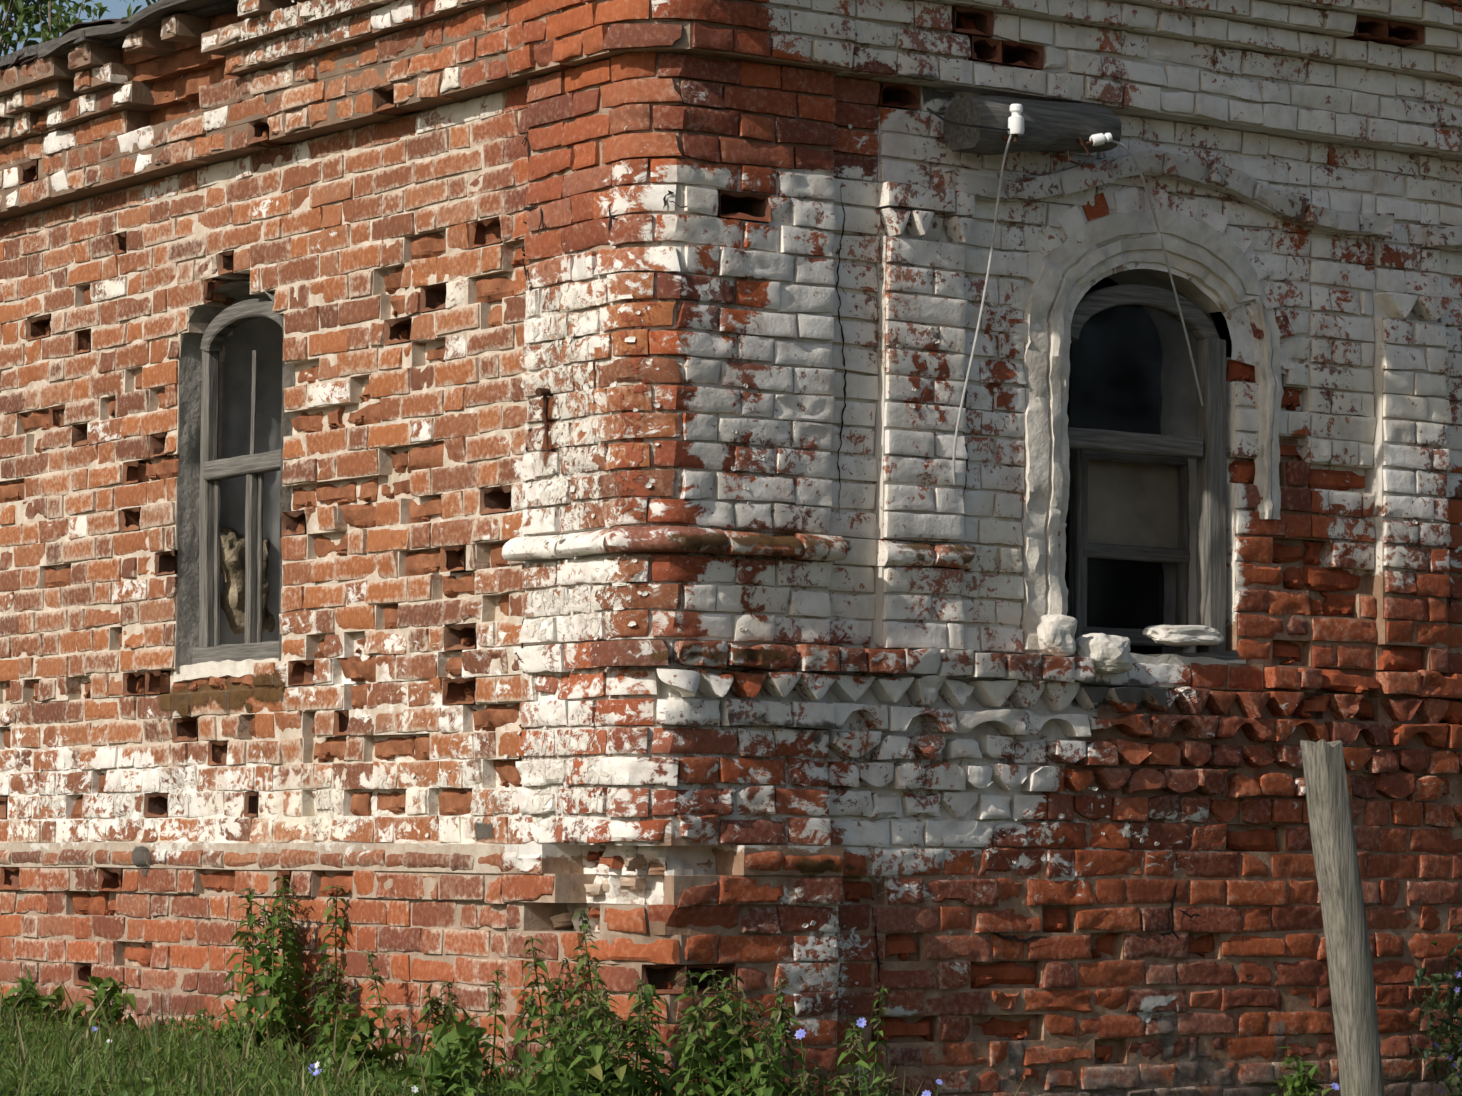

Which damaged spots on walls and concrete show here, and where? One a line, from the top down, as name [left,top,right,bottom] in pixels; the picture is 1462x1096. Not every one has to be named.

spalling [888,6,1044,69]
spalling [1344,15,1424,47]
spalling [716,189,771,223]
peeling [469,217,661,543]
spalling [1279,444,1365,491]
spalling [1272,510,1433,616]
peeling [524,559,648,652]
spalling [122,671,254,696]
spalling [172,717,229,765]
peeling [26,769,196,828]
spalling [244,792,259,817]
peeling [1035,787,1159,861]